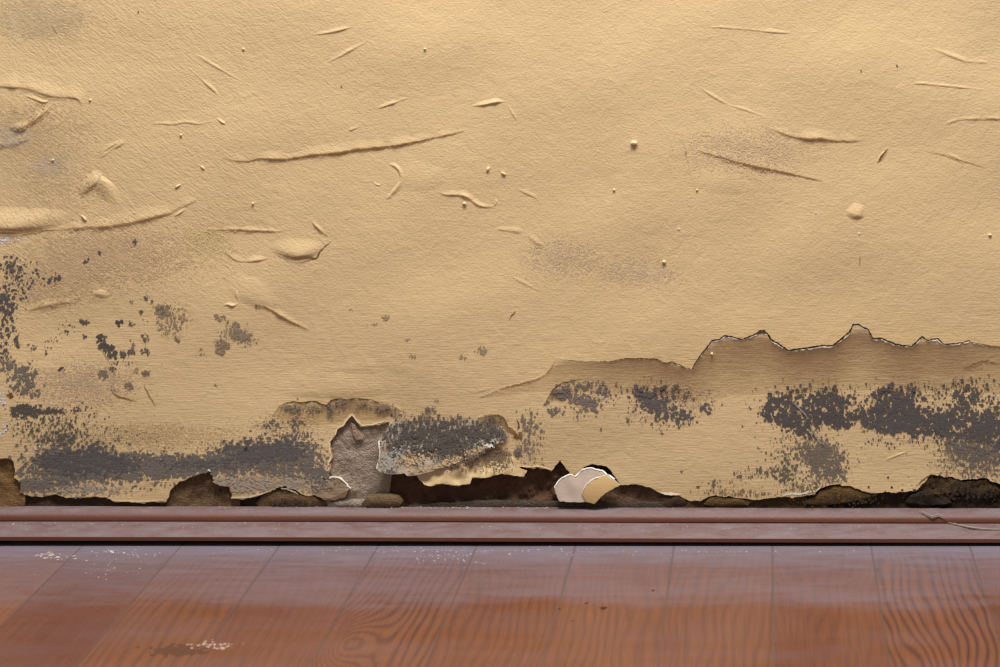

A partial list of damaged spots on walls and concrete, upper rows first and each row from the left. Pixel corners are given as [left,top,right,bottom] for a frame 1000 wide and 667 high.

water stain [640,107,843,191]
water stain [0,86,723,499]
peeling [479,325,1000,406]
peeling [0,459,298,507]
peeling [273,399,1000,508]
water stain [687,368,1000,499]